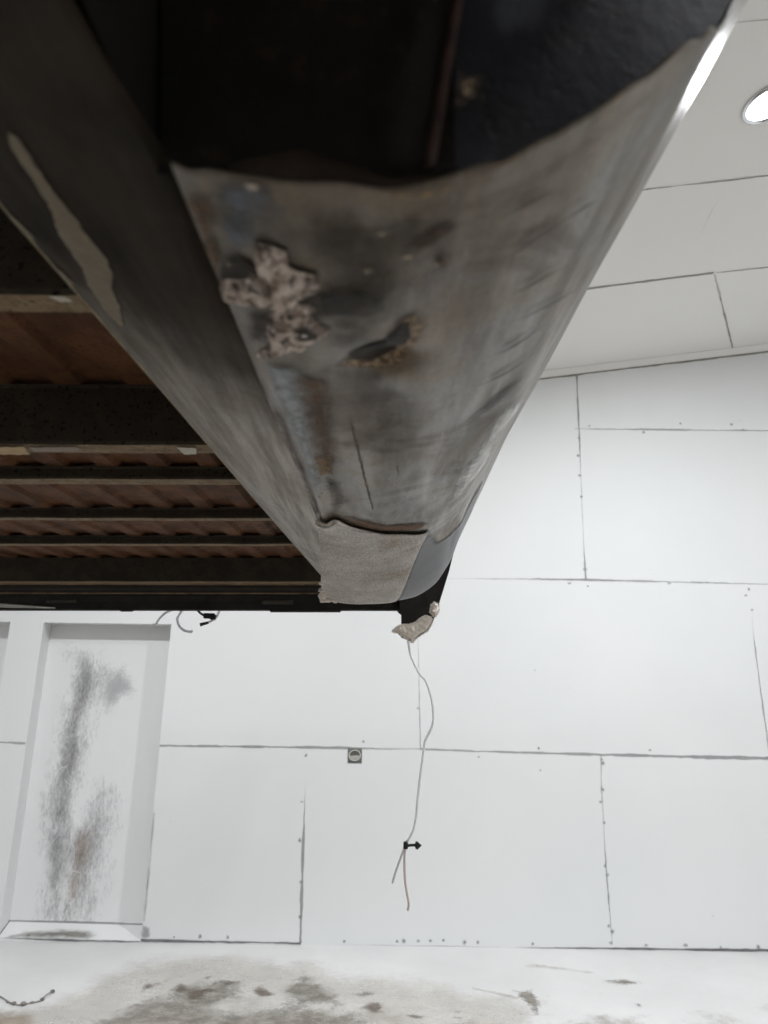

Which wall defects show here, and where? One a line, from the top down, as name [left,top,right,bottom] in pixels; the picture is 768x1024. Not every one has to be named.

peeling [0,206,36,241]
peeling [8,132,123,327]
peeling [219,243,330,359]
damp [517,991,540,1012]